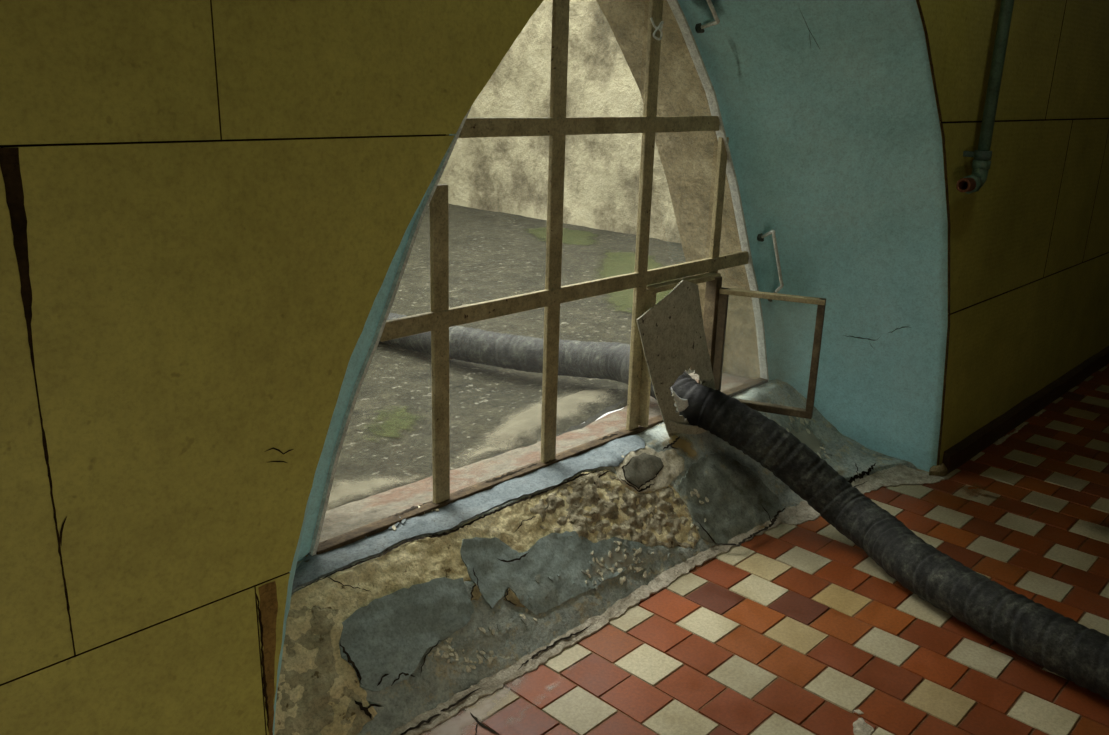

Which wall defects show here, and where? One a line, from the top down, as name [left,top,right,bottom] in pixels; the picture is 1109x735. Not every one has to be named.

crack [0,148,75,649]
spalling [274,434,780,735]
crack [848,462,879,483]